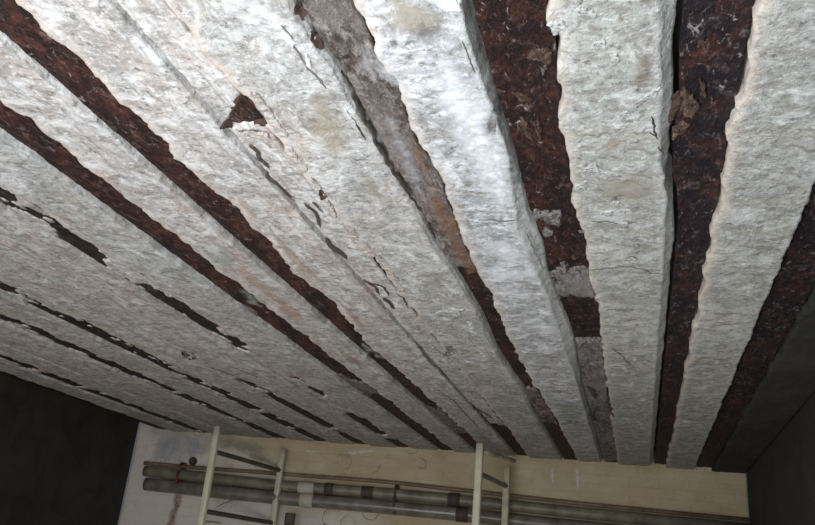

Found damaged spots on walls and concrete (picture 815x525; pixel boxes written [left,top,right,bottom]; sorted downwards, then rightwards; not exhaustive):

spalling [294,2,308,21]
flaking render [426,0,462,13]
flaking render [547,20,567,36]
spalling [310,31,325,50]
corrosion [527,46,552,65]
spalling [219,90,289,140]
spalling [486,111,497,137]
spalling [668,77,707,141]